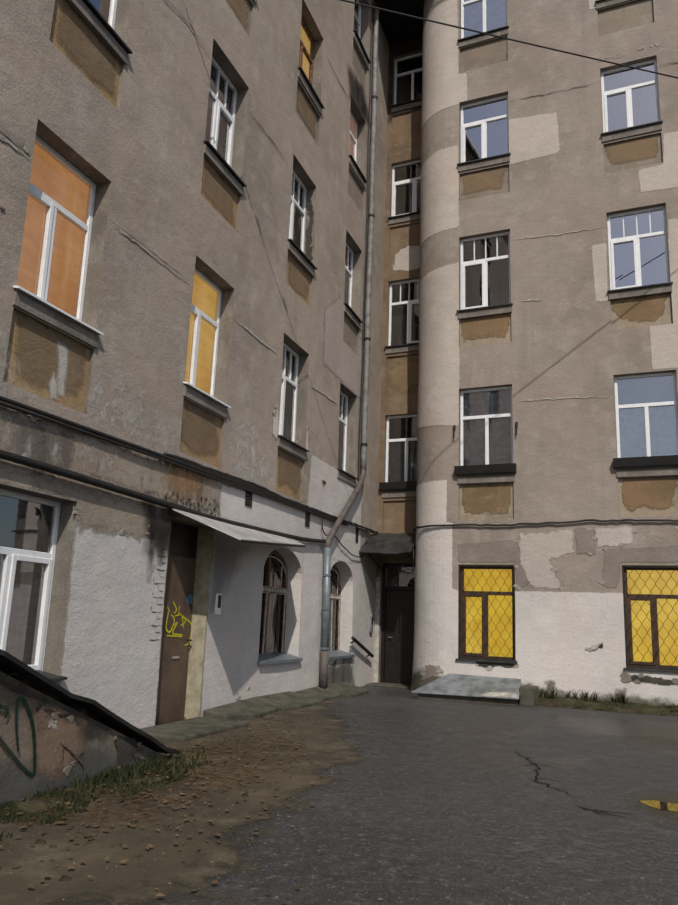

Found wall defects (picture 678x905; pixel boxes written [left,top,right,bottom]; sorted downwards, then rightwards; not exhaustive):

crack [0,132,30,159]
flaking render [458,525,678,591]
flaking render [620,672,678,686]